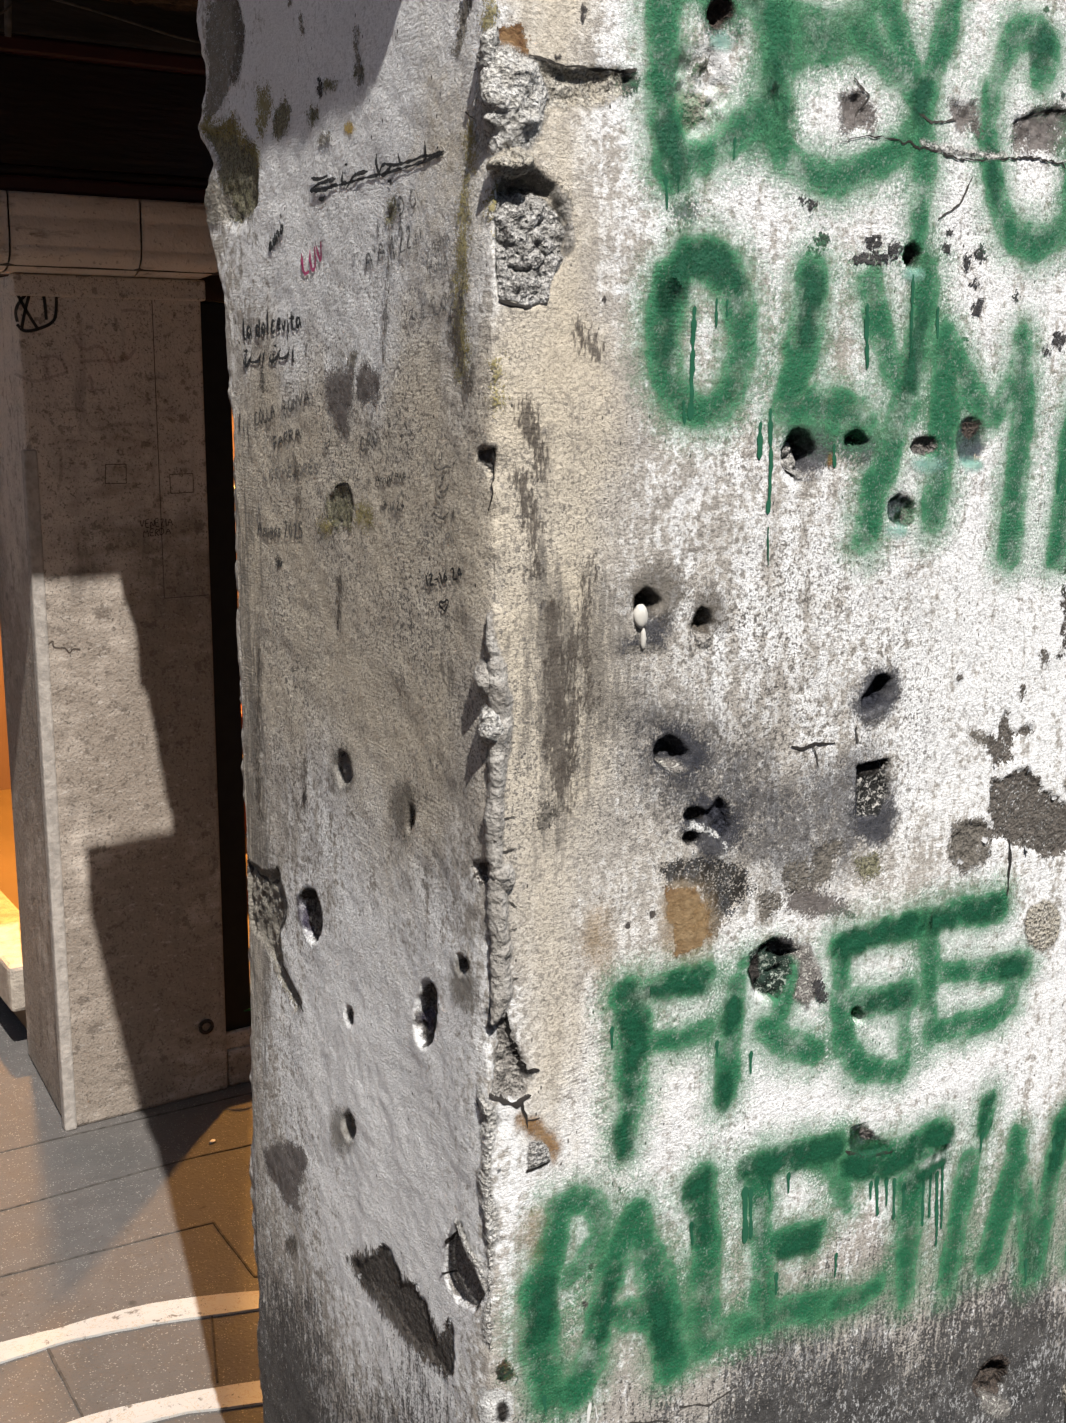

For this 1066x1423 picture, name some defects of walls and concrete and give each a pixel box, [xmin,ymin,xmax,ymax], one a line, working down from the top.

crack [842,77,1066,219]
spalling [481,163,575,309]
spalling [961,420,982,469]
peeling [1039,564,1066,667]
peeling [946,684,1066,896]
spalling [247,858,304,1014]
spalling [441,1008,540,1423]
peeling [346,1242,454,1380]